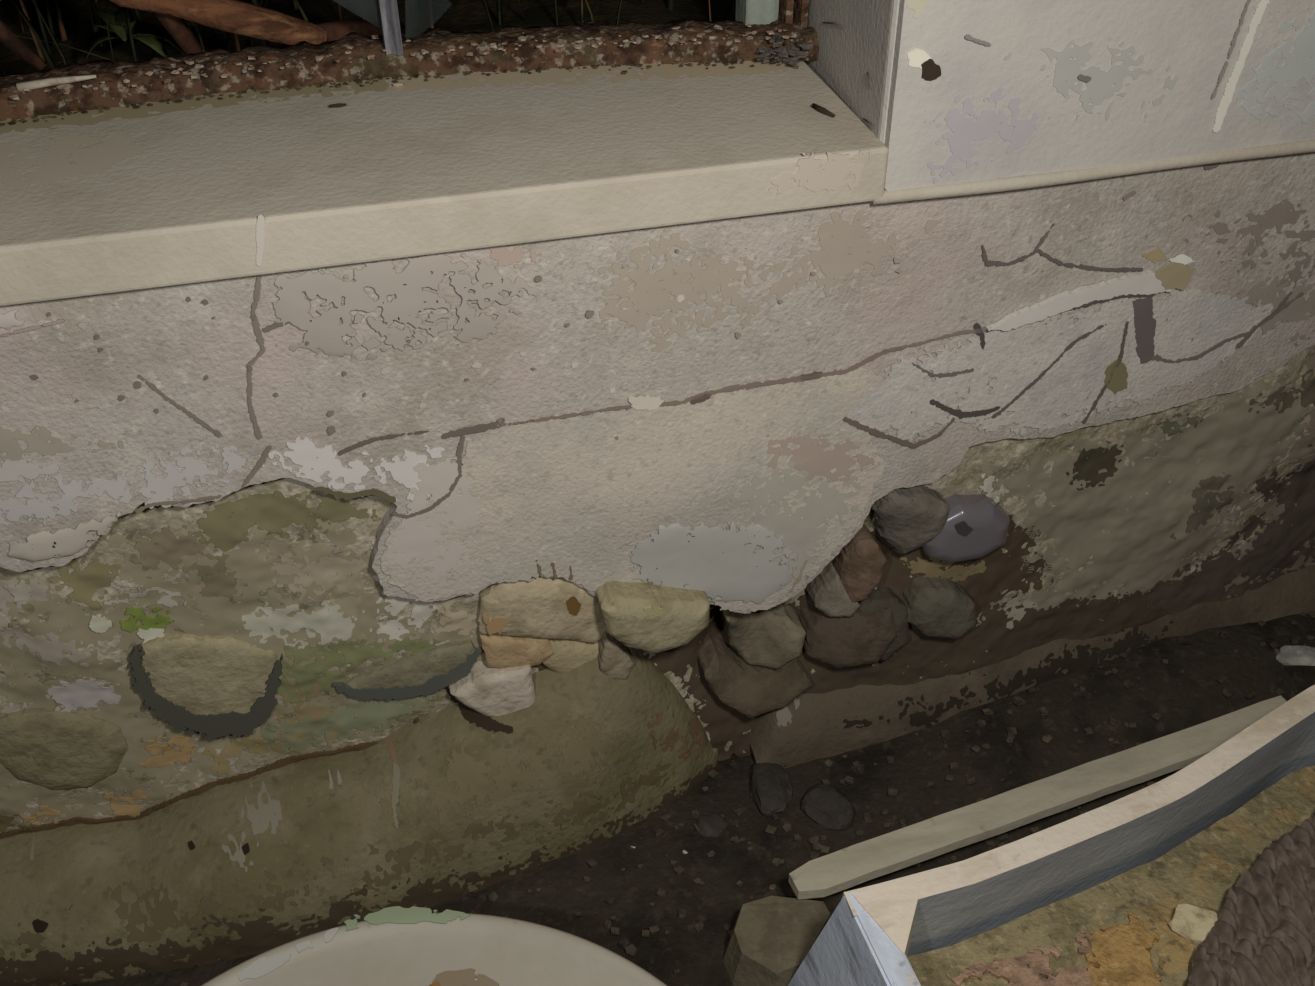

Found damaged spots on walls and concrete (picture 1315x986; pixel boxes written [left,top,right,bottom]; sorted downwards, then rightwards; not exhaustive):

crack [1123,191,1136,200]
crack [135,275,290,513]
crack [315,223,1304,519]
damp [1157,413,1204,436]
damp [1244,369,1315,414]
spalling [0,490,485,829]
spalling [637,607,763,761]